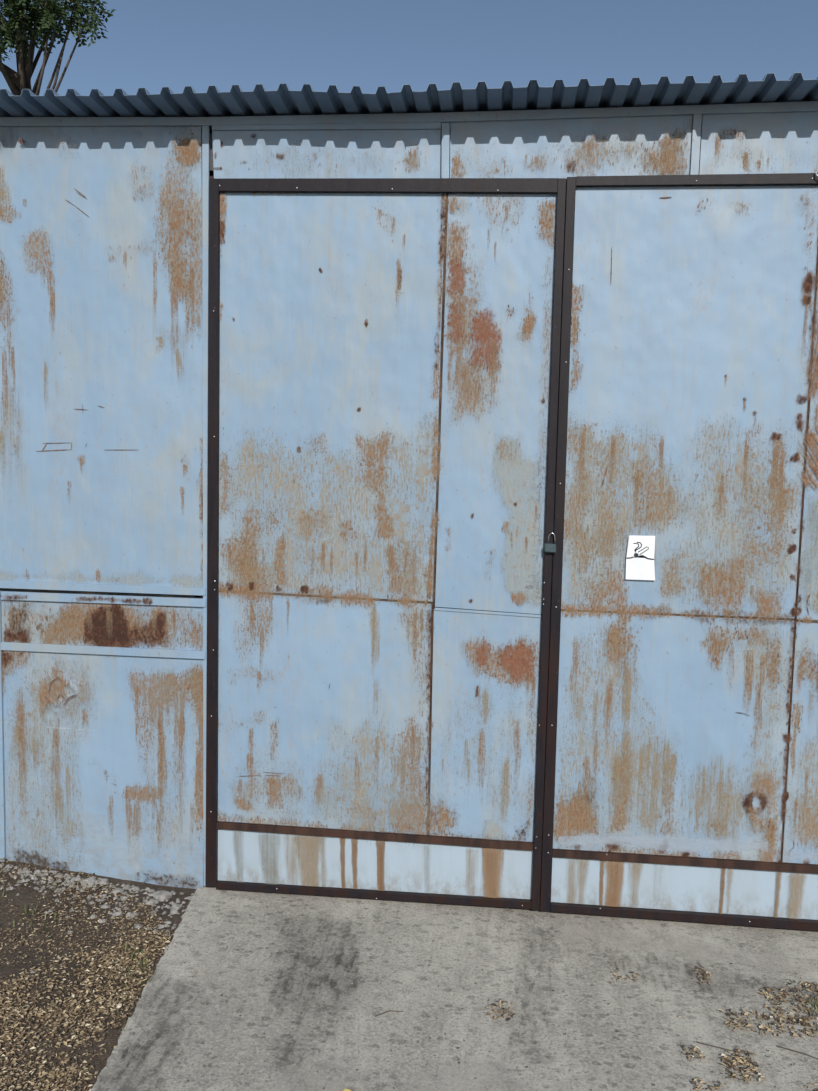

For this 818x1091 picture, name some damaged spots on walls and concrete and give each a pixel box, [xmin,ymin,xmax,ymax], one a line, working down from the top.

corrosion [132,133,202,372]
corrosion [431,193,523,420]
corrosion [507,201,556,403]
corrosion [565,132,688,176]
corrosion [790,266,818,504]
corrosion [0,595,203,697]
corrosion [104,665,203,844]
corrosion [218,515,472,891]
corrosion [465,637,539,746]
corrosion [553,596,818,918]
corrosion [787,519,804,580]
corrosion [483,837,503,898]